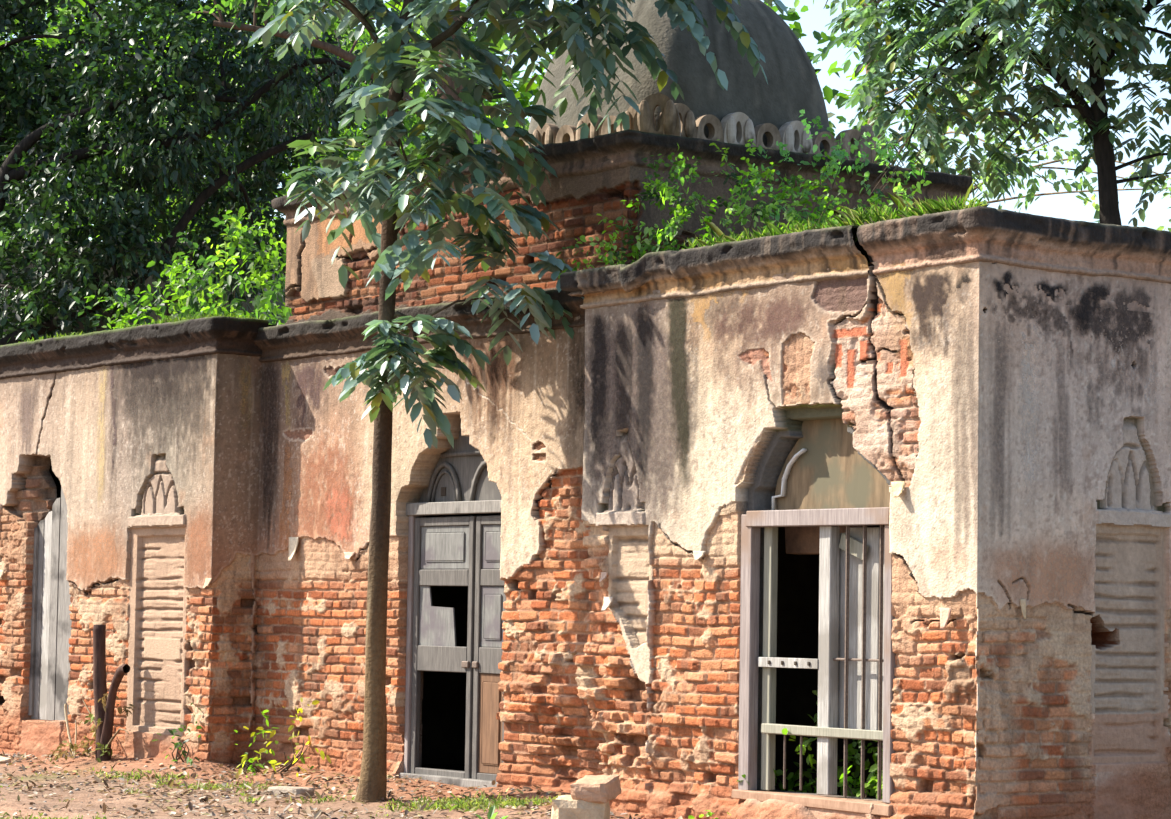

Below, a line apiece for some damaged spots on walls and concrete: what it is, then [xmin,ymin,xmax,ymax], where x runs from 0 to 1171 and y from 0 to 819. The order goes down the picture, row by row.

spalling [289,260,380,321]
spalling [396,195,629,306]
flaking render [533,441,546,461]
water stain [573,298,689,513]
spalling [814,270,921,497]
crack [829,255,919,475]
spalling [0,453,57,753]
spalling [61,578,130,756]
spalling [177,536,369,776]
spalling [385,535,408,778]
spalling [496,467,748,819]
spalling [890,554,1097,819]